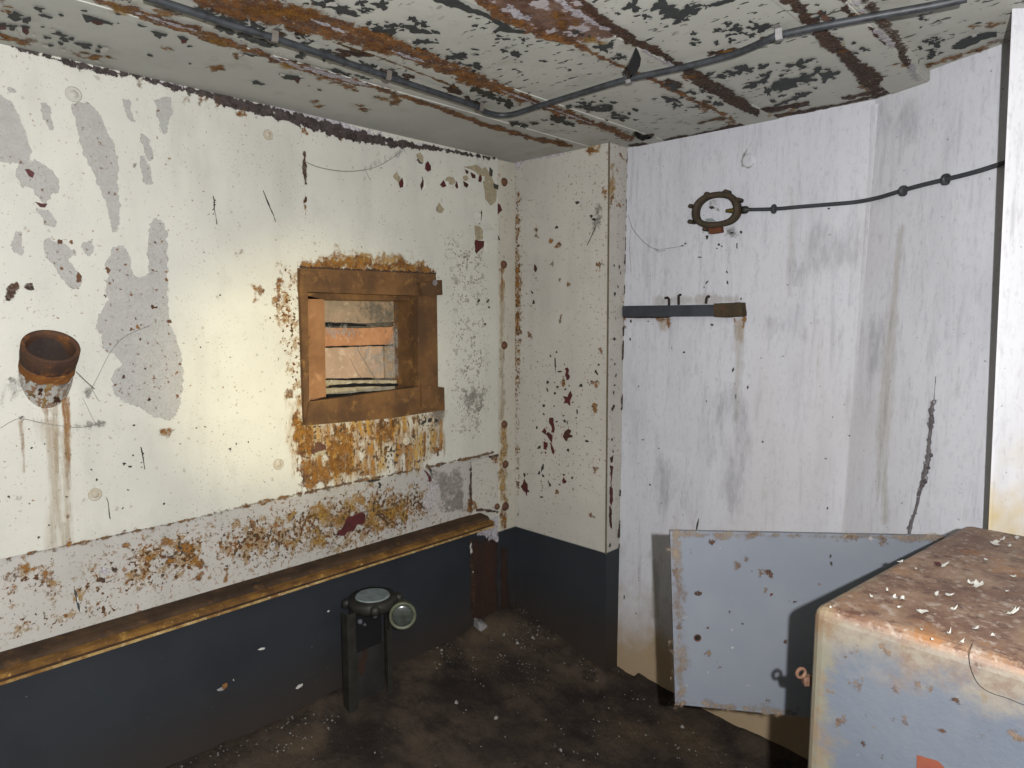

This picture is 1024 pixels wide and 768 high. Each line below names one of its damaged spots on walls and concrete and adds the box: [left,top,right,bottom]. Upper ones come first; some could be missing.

peeling [0,87,94,289]
peeling [72,102,121,232]
spalling [311,0,454,51]
spalling [434,0,529,73]
spalling [470,86,639,128]
spalling [614,0,773,46]
spalling [661,58,841,111]
peeling [95,218,184,420]
peeling [440,162,502,437]
corrosion [0,192,532,638]
peeling [521,351,600,498]
crack [906,377,937,534]